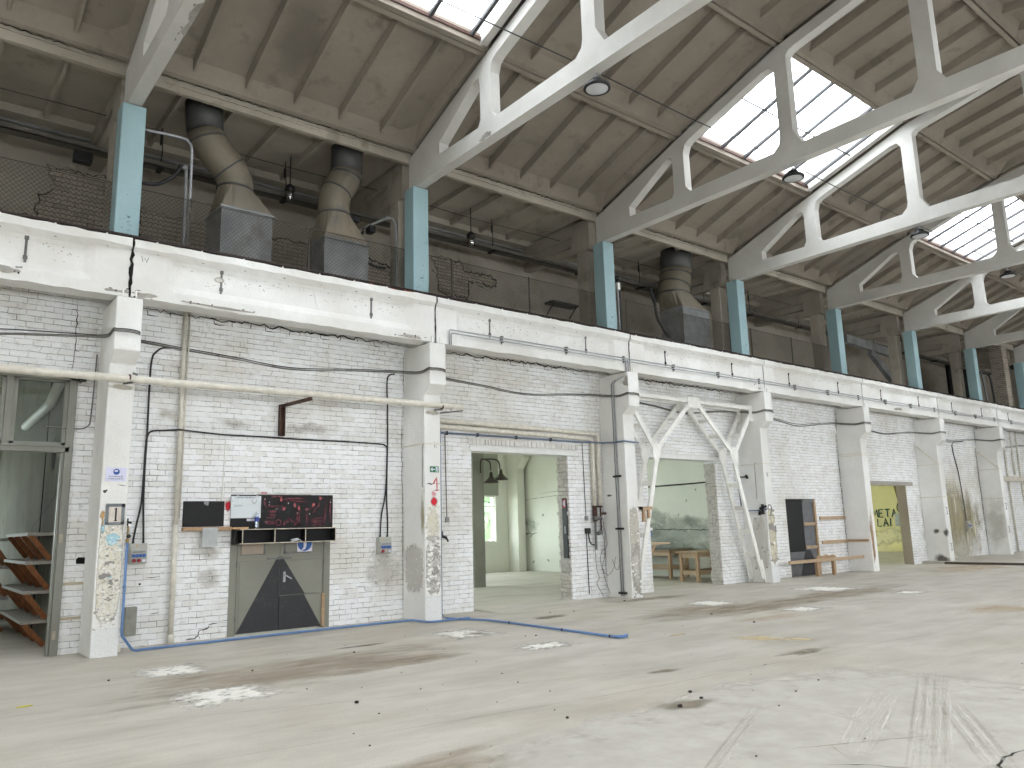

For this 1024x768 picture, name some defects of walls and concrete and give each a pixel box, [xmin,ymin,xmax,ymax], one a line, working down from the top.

flaking render [23,163,106,229]
flaking render [416,255,497,300]
crack [122,238,404,460]
peeling [92,515,123,630]
crack [398,486,406,609]
peeling [404,536,441,595]
peeling [754,508,779,569]
leakage [934,492,981,561]